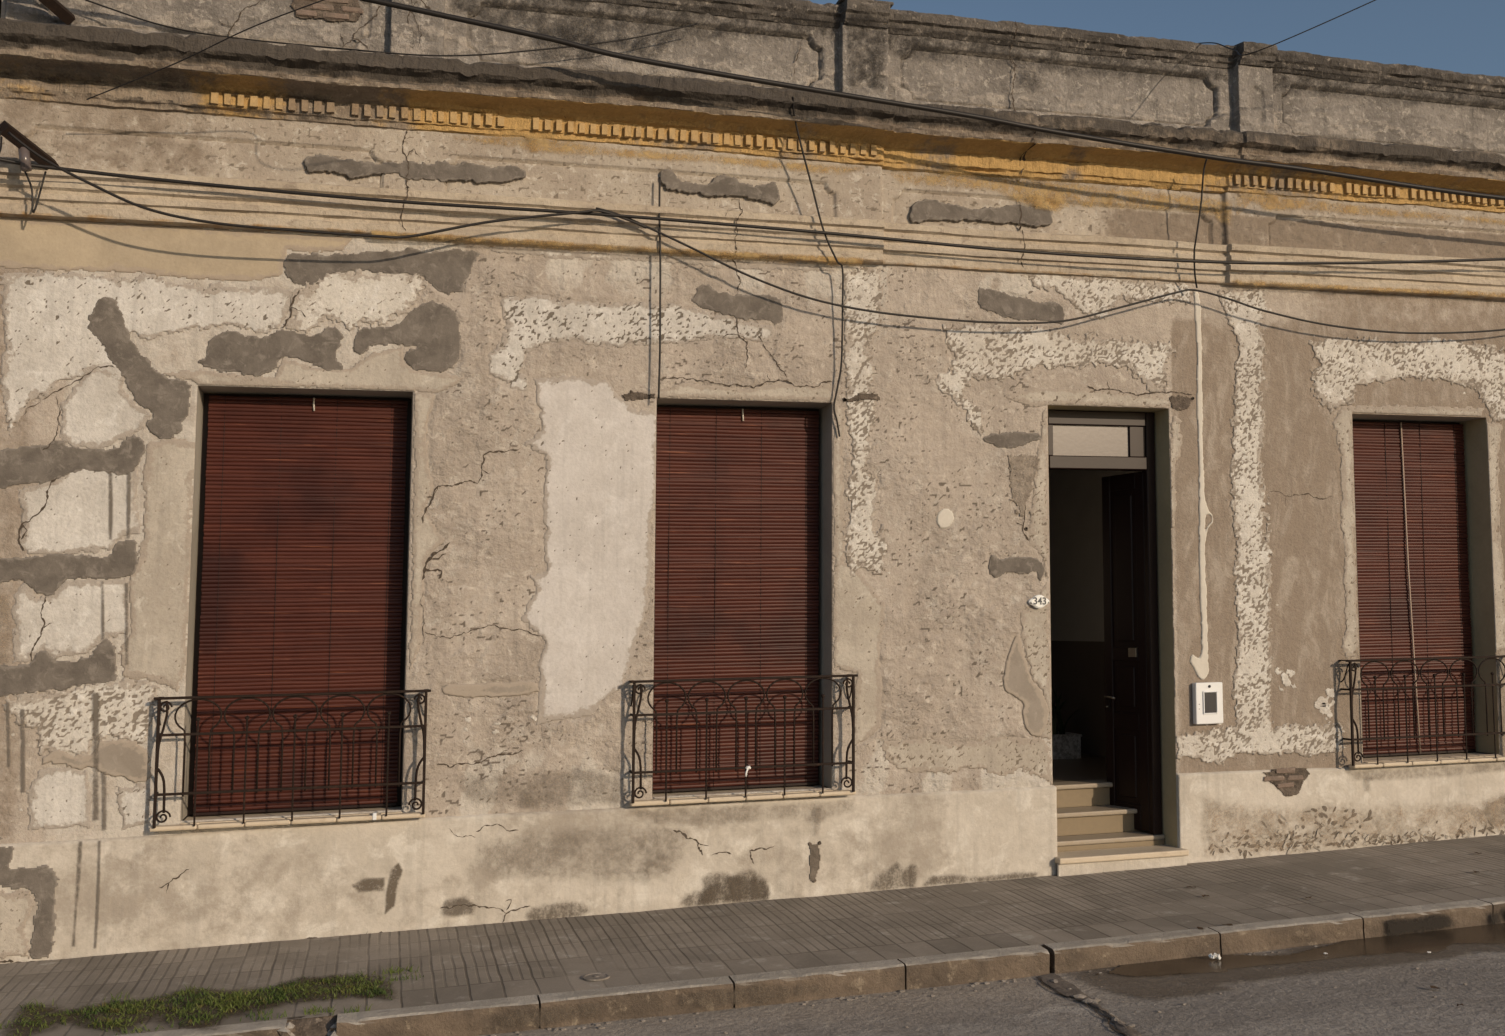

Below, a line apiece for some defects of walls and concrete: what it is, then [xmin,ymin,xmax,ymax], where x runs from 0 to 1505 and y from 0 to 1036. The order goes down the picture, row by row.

flaking render [622,383,655,401]
flaking render [842,393,880,402]
crack [420,449,539,643]
spalling [1263,767,1310,797]
flaking render [1209,806,1505,859]